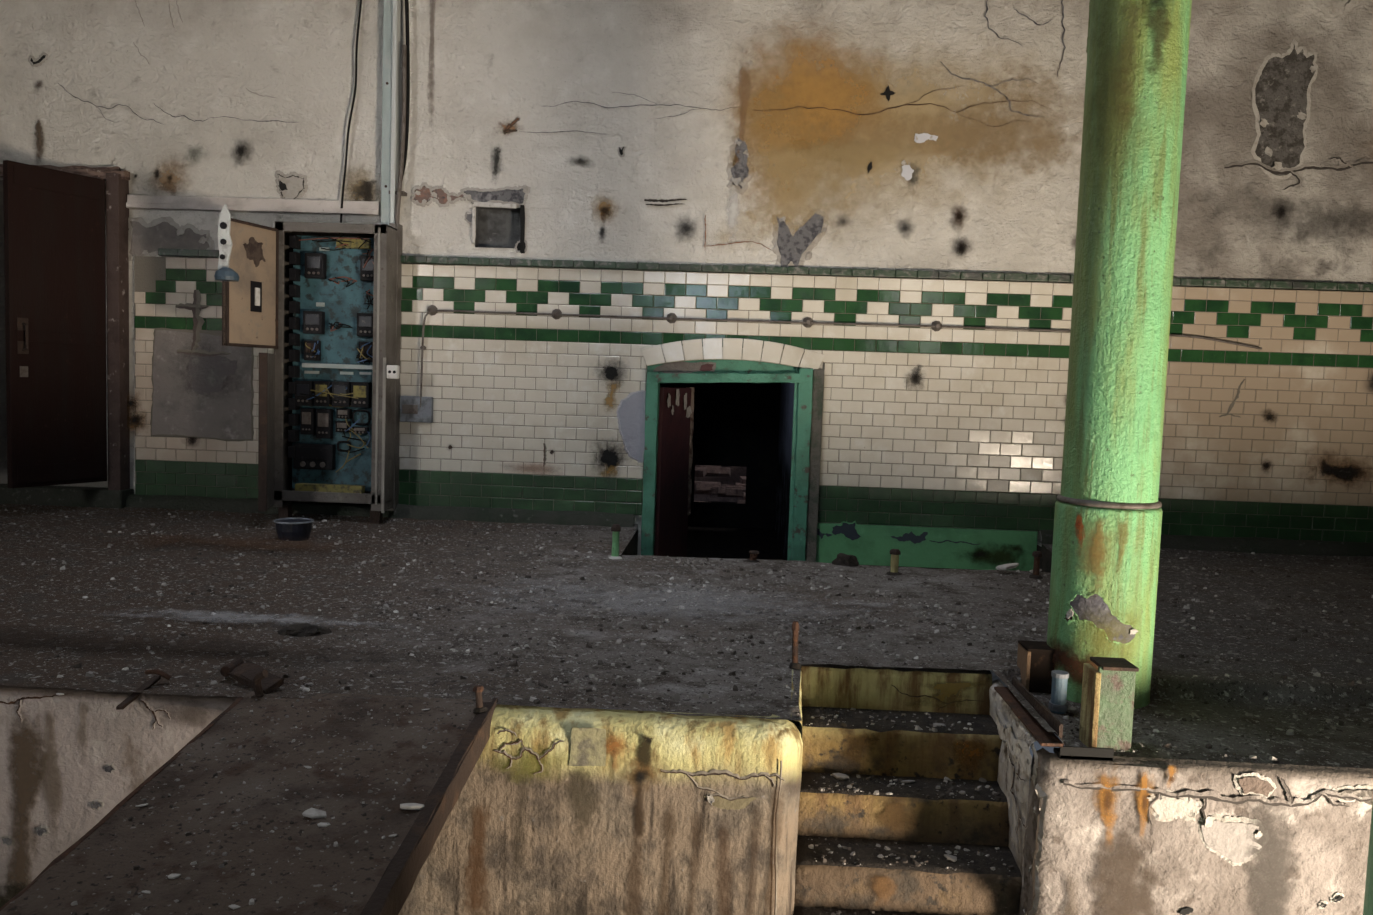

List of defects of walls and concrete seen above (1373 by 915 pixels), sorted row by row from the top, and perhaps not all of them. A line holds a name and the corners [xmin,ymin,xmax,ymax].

damp [1150,10,1169,58]
crack [58,82,296,124]
crack [519,61,1050,134]
flaking render [1250,39,1318,180]
crack [1224,157,1373,191]
peeling [128,216,215,261]
corrosion [1075,514,1103,576]
peeling [1061,590,1139,647]
crack [494,729,565,775]
corrosion [1096,778,1118,838]
spalling [996,709,1373,915]
crack [1063,778,1373,825]